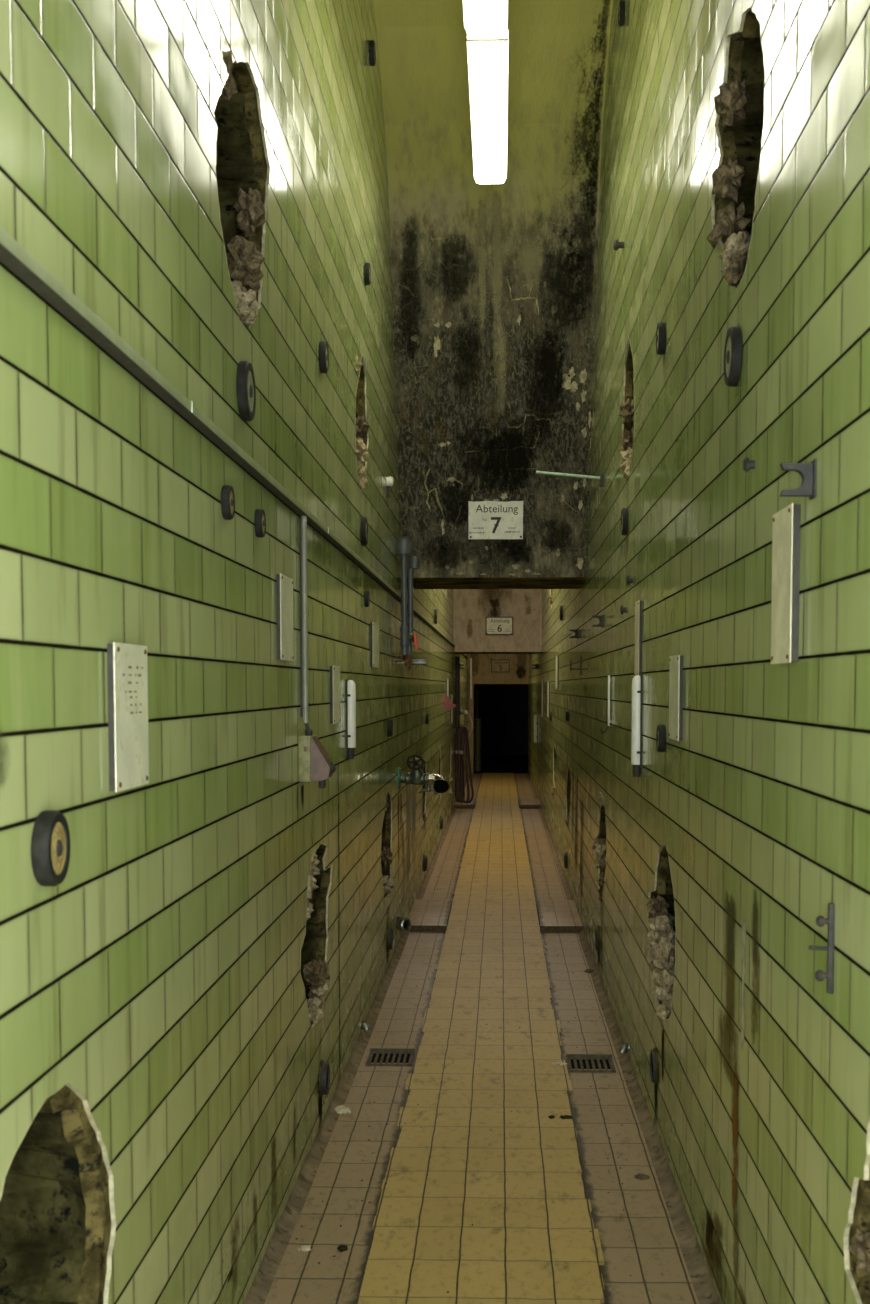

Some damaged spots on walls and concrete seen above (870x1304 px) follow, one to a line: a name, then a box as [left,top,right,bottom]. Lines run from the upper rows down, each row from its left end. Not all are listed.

spalling [214,51,270,327]
damp [399,219,421,358]
damp [427,0,610,568]
spalling [706,7,765,290]
spalling [300,844,333,1027]
spalling [646,843,676,1080]
spalling [0,1083,116,1304]
spalling [844,1118,870,1304]